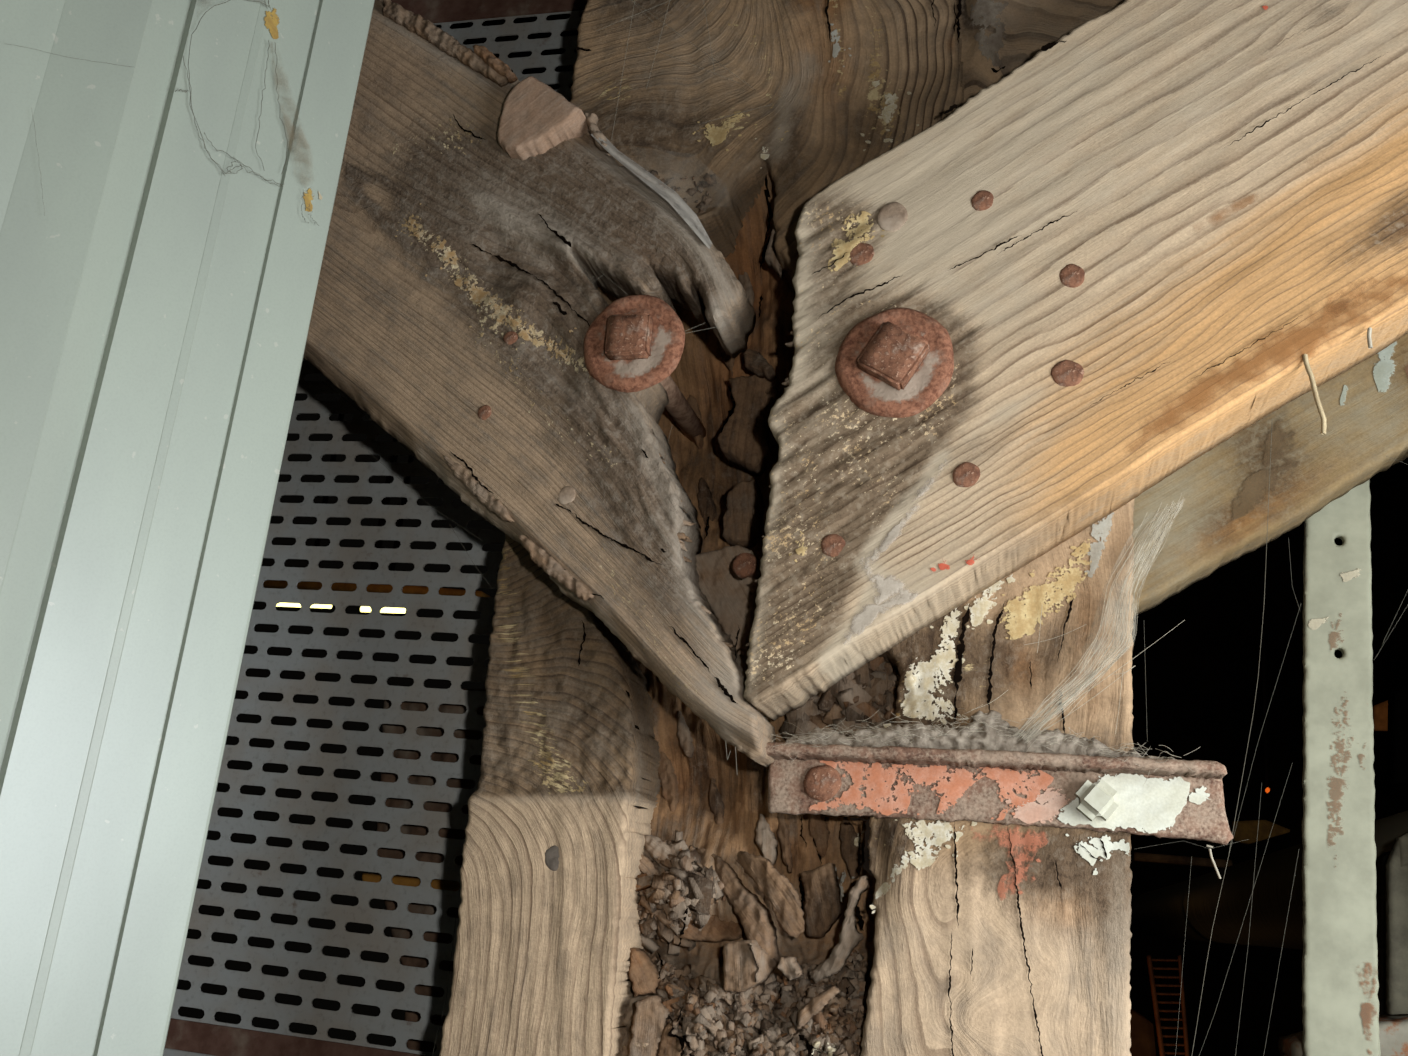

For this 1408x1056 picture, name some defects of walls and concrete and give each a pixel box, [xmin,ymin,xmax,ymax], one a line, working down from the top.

crack [758,175,773,318]
spalling [658,113,795,669]
leakage [1157,301,1357,428]
crack [450,451,492,493]
crack [556,504,666,565]
crack [564,569,604,666]
crack [670,625,740,704]
spalling [765,512,1114,743]
spalling [619,652,1210,1056]
crack [948,827,973,1056]
crack [1008,832,1043,1056]
rust [1360,963,1376,1033]